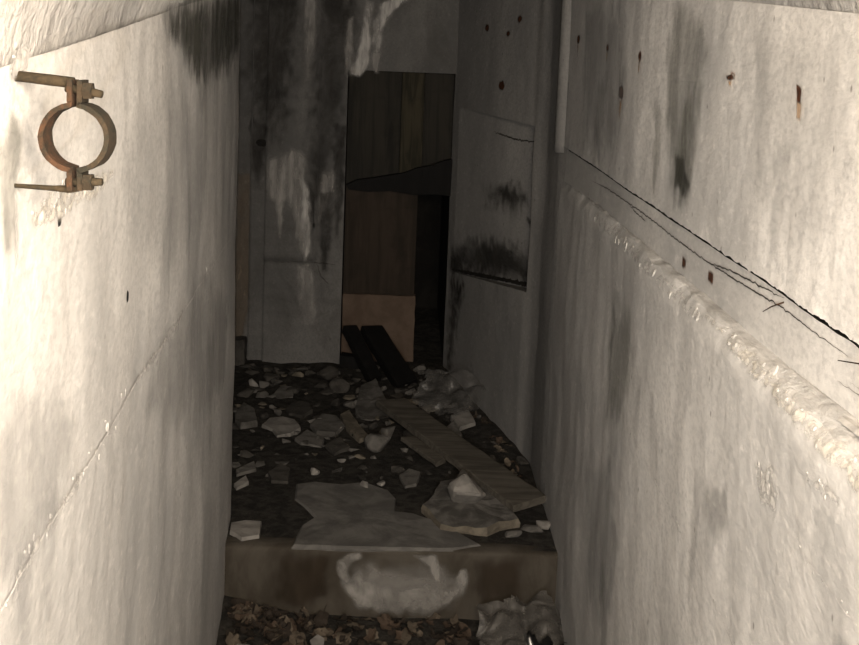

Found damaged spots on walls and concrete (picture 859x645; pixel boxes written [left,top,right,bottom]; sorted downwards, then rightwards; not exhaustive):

water stain [172,0,239,81]
water stain [305,0,315,68]
water stain [346,0,404,76]
water stain [675,157,689,194]
water stain [253,149,344,324]
crack [569,150,859,356]